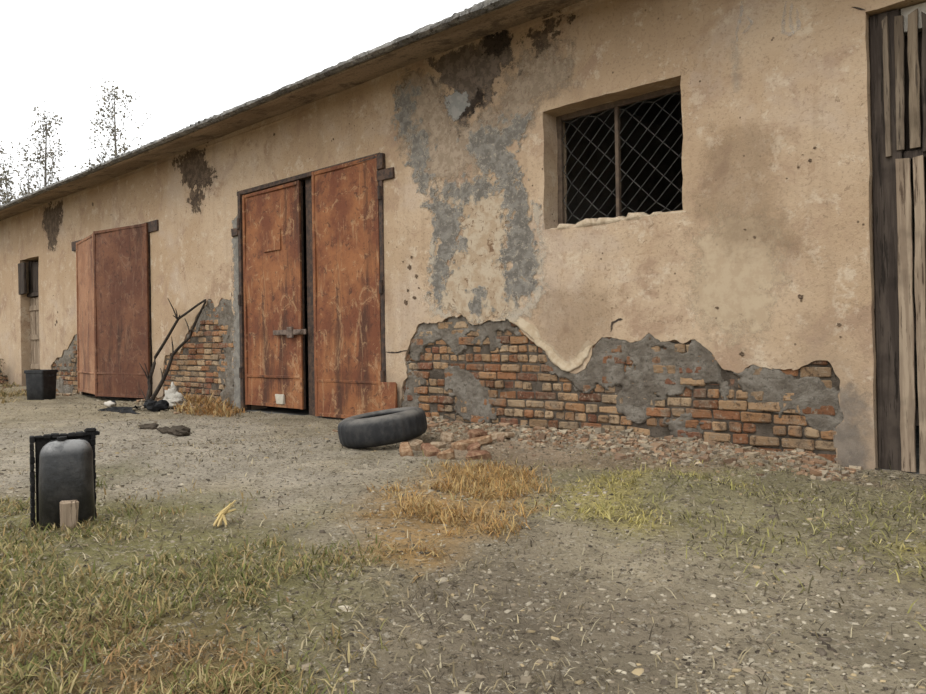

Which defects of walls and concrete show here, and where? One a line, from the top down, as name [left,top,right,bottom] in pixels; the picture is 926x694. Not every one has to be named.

flaking render [52,334,80,394]
flaking render [164,214,241,409]
flaking render [390,29,844,462]